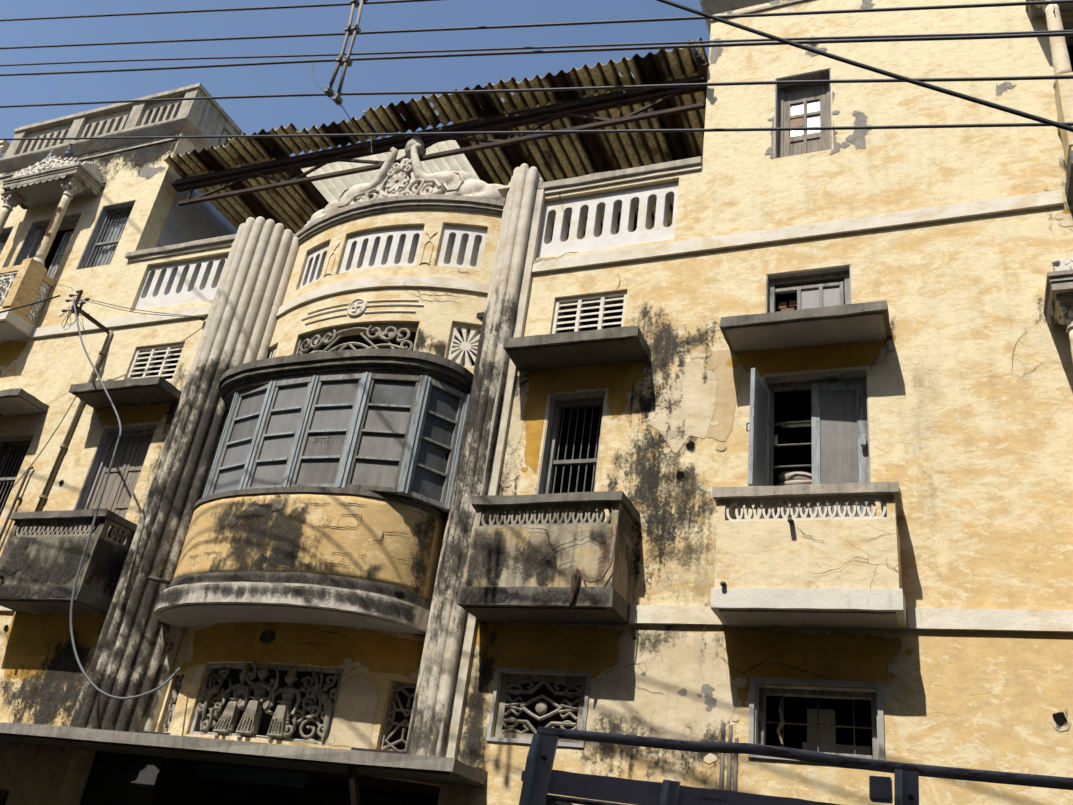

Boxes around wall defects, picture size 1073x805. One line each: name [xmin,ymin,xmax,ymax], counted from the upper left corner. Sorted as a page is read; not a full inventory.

spalling [830,91,870,154]
leakage [63,133,180,188]
peeling [1054,200,1073,231]
peeling [645,346,743,454]
leakage [608,306,716,600]
crack [189,504,273,567]
leakage [0,292,612,733]
crack [277,502,420,568]
crack [519,527,614,567]
leakage [405,621,499,770]
peeling [584,629,748,764]